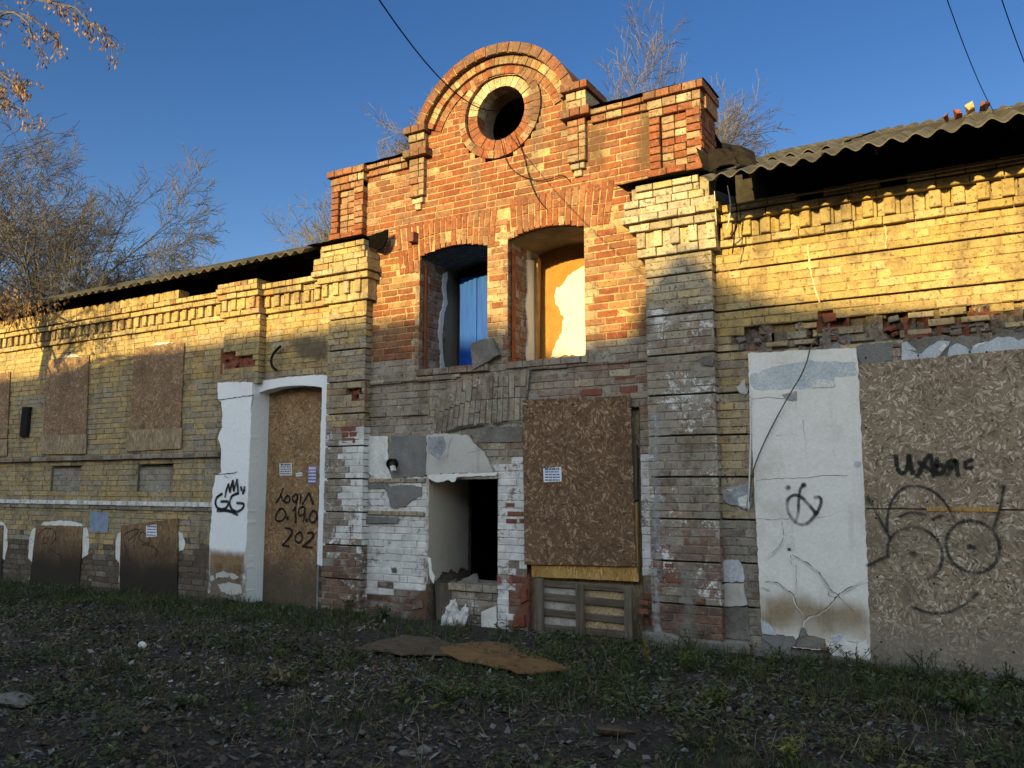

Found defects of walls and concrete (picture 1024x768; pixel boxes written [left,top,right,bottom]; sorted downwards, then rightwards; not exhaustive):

spalling [220,349,257,375]
spalling [729,324,772,353]
peeling [750,310,857,400]
spalling [873,302,1024,360]
peeling [341,426,497,487]
flaking render [506,503,524,523]
water stain [205,552,245,602]
crack [756,518,868,637]
water stain [767,599,864,634]